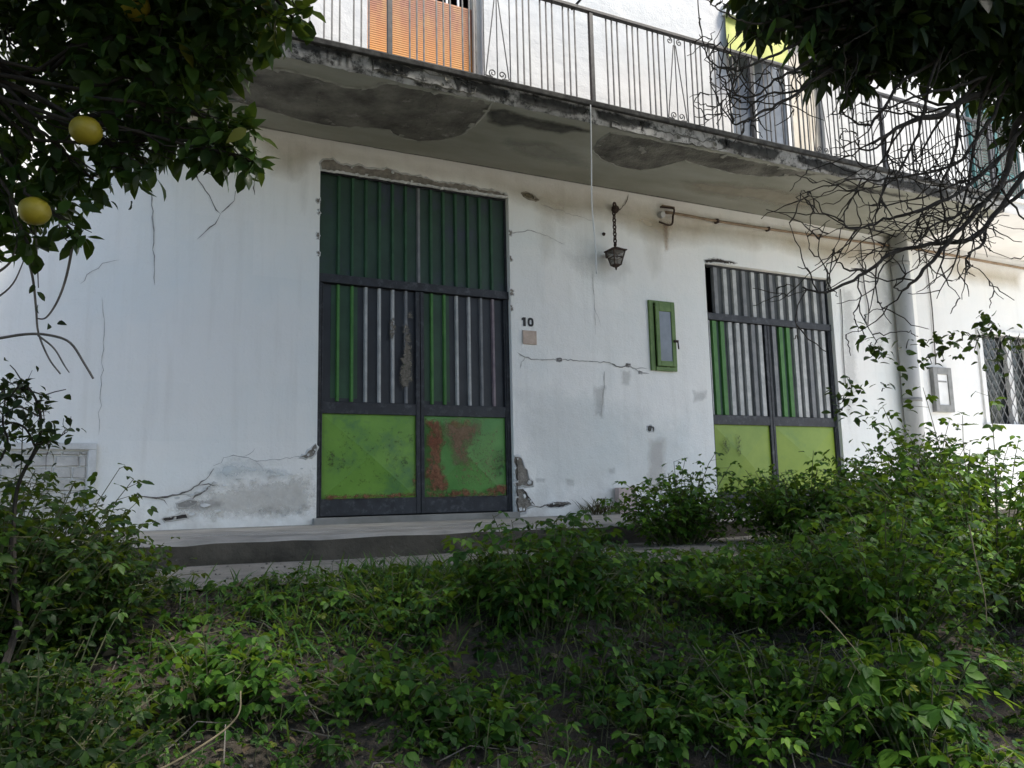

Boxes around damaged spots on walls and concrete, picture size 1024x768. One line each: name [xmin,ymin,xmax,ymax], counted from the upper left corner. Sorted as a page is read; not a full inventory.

peeling [209,58,494,142]
spalling [319,157,508,198]
peeling [592,120,826,177]
crack [517,352,649,414]
crack [131,450,300,504]
corrosion [326,421,507,500]
spalling [513,454,570,515]